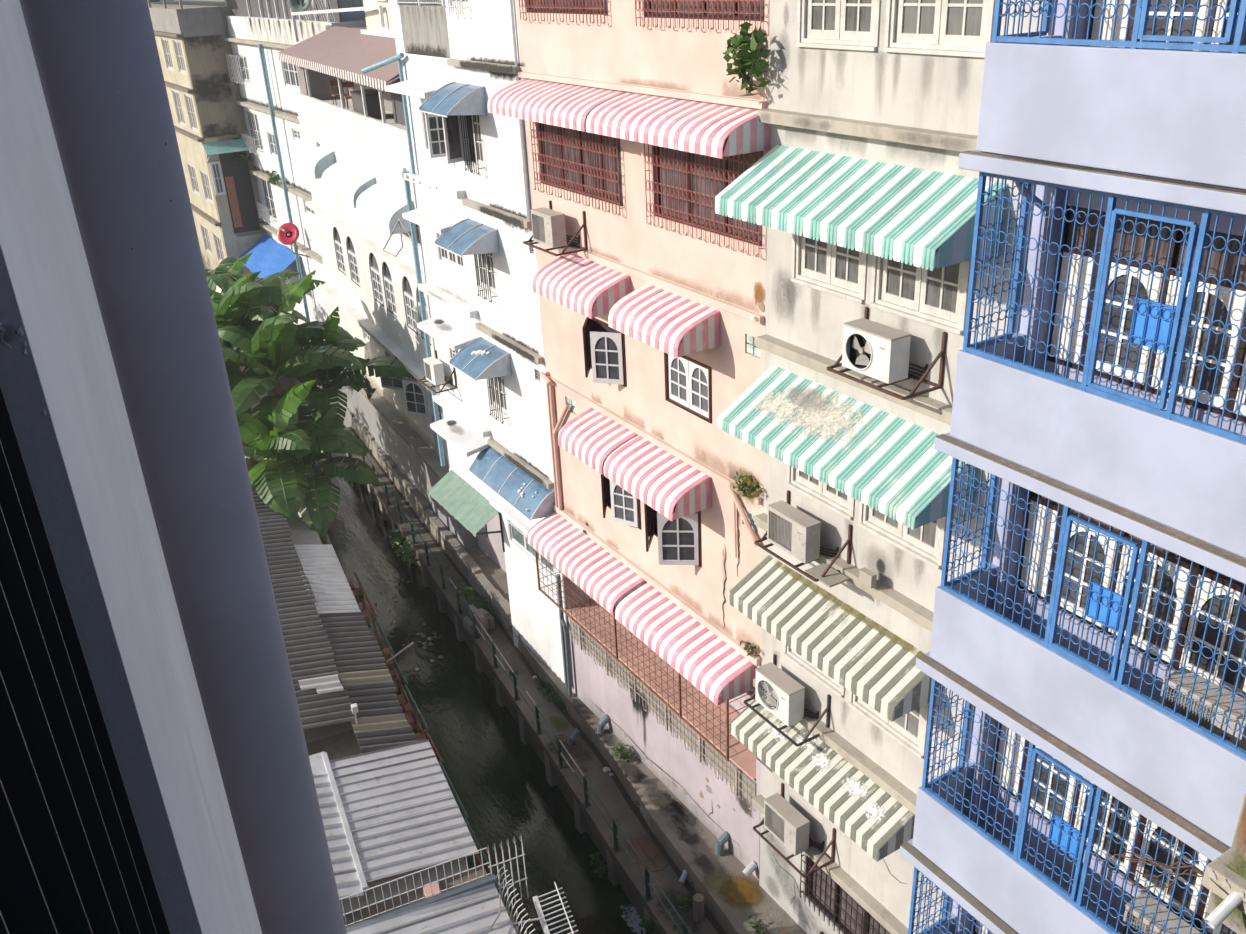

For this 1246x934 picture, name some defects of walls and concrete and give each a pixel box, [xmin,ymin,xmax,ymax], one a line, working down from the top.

crack [722,511,740,629]
damp [631,686,648,739]